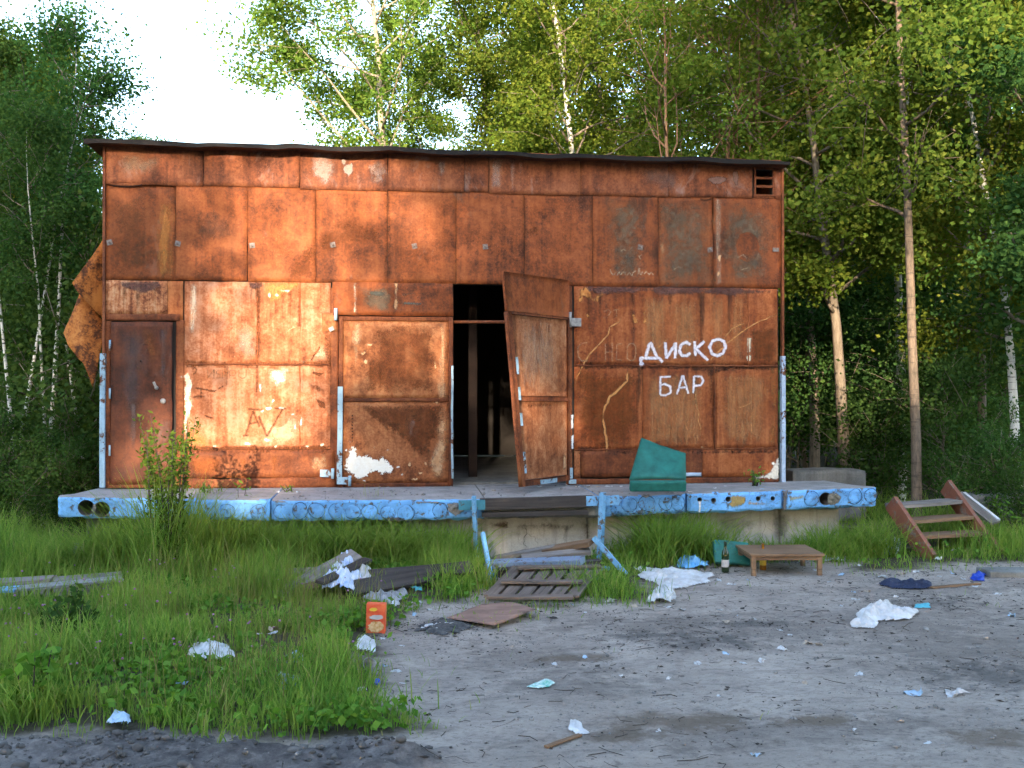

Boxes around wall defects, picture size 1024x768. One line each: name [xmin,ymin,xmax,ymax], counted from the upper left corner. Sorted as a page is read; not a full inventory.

rust [247,249,312,373]
rust [587,286,761,326]
rust [367,326,434,392]
peeling [184,375,192,432]
rust [187,432,326,473]
peeling [344,421,446,481]
rust [365,405,442,454]
rust [578,330,775,453]